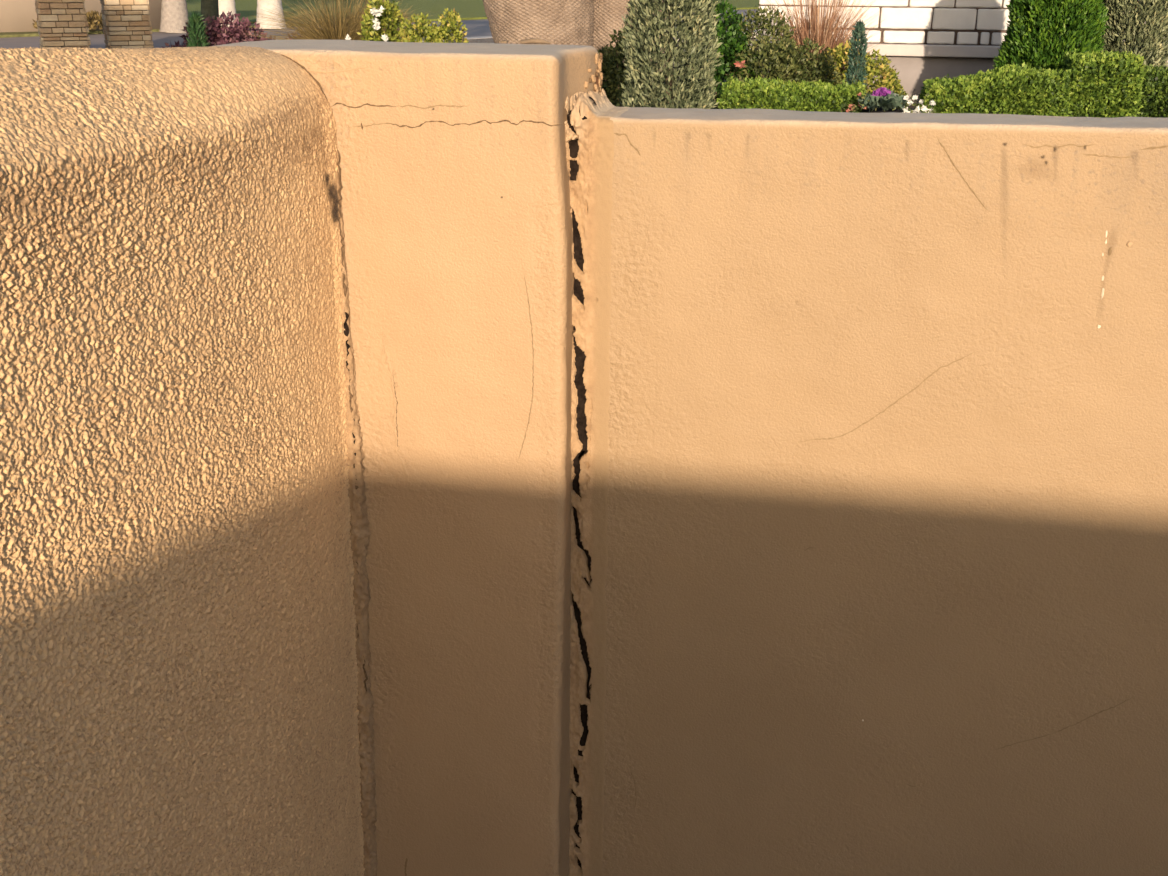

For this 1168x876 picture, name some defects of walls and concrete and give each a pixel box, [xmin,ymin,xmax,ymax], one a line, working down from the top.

crack [282,55,597,181]
crack [614,133,641,156]
crack [337,150,359,489]
crack [518,275,534,460]
crack [572,209,592,868]
crack [356,608,368,692]